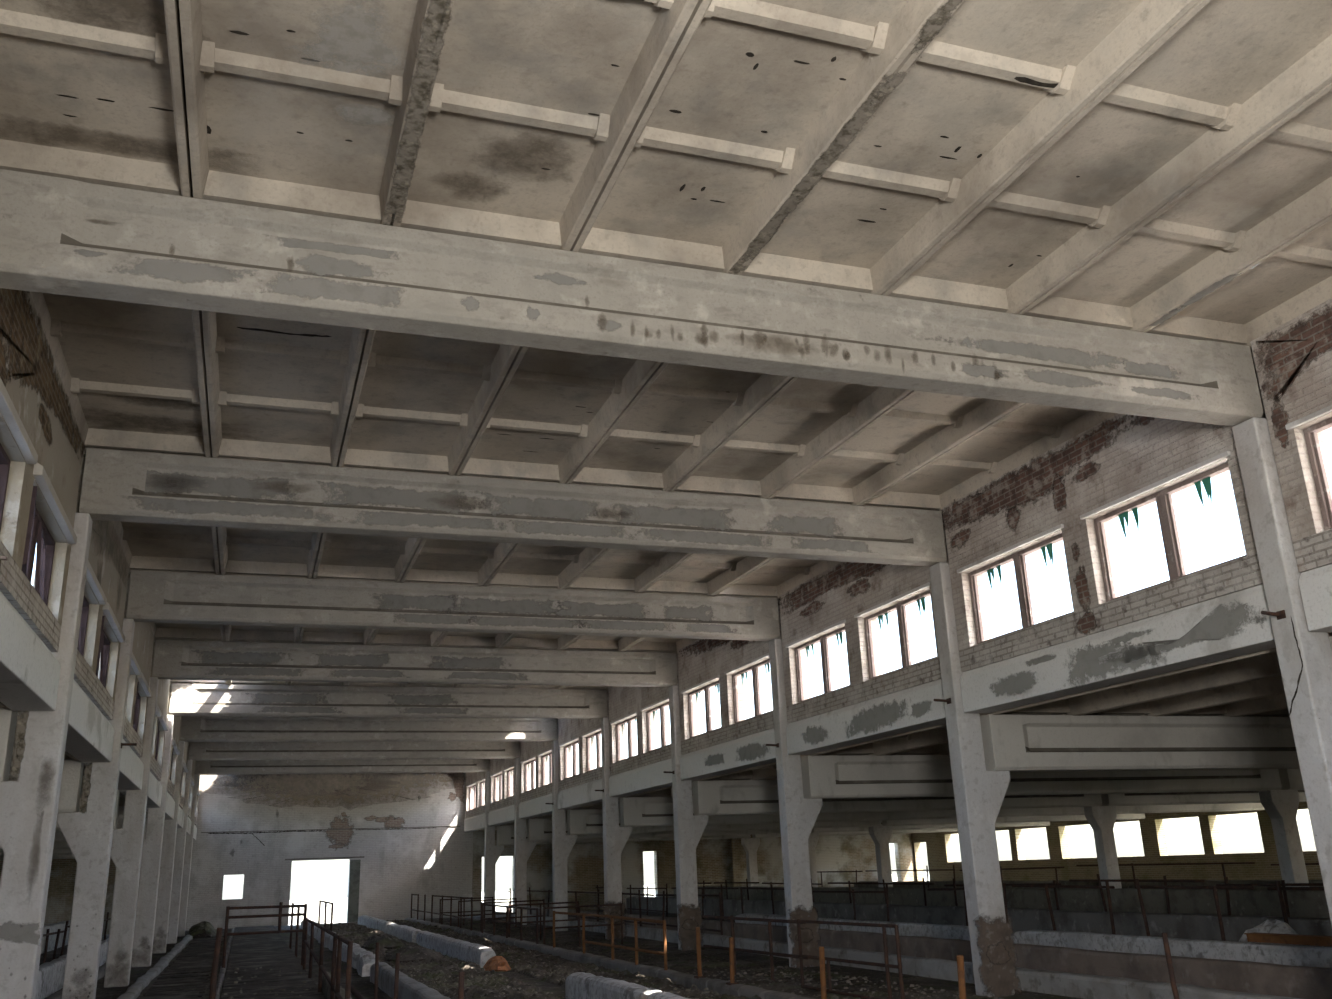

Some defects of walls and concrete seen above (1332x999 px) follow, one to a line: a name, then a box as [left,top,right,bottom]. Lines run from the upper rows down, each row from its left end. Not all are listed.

spalling [912,0,962,53]
spalling [384,0,452,223]
spalling [730,73,906,273]
flaking render [0,288,86,460]
flaking render [1256,305,1332,448]
flaking render [942,415,1154,548]
flaking render [681,639,749,657]
flaking render [778,562,892,616]
flaking render [325,812,405,849]